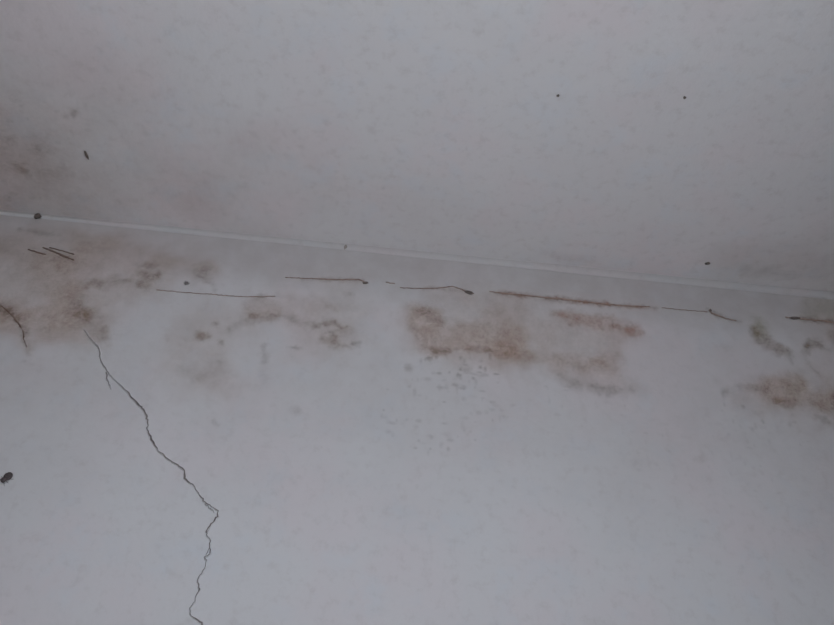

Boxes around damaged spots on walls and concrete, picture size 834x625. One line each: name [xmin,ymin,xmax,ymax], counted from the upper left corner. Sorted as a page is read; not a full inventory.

crack [285,275,365,283]
crack [386,282,465,291]
crack [156,289,275,297]
crack [489,291,737,321]
crack [84,329,220,625]